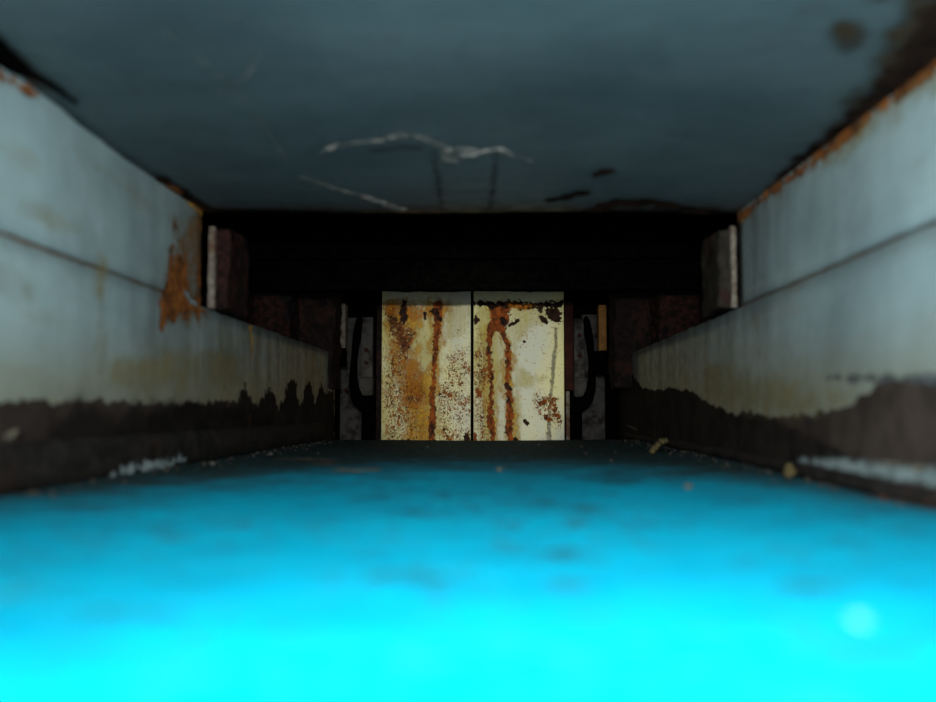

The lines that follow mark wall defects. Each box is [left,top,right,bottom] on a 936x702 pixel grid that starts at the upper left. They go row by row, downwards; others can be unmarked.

corrosion [0,38,79,104]
corrosion [154,177,235,332]
crack [300,178,408,210]
crack [327,135,531,196]
corrosion [738,0,936,222]
corrosion [381,299,564,441]